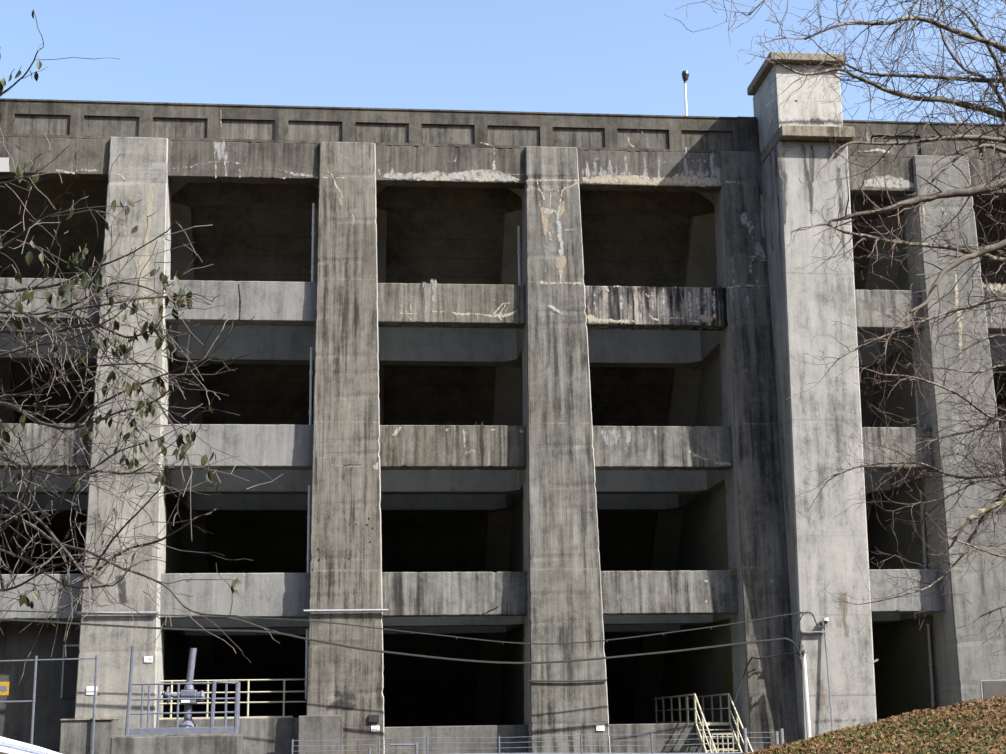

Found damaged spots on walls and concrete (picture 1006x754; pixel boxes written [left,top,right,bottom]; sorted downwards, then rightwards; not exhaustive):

efflorescence [582,129,660,178]
spalling [582,174,722,187]
efflorescence [682,147,721,181]
leakage [760,144,815,250]
spalling [740,213,768,262]
leakage [588,284,727,320]